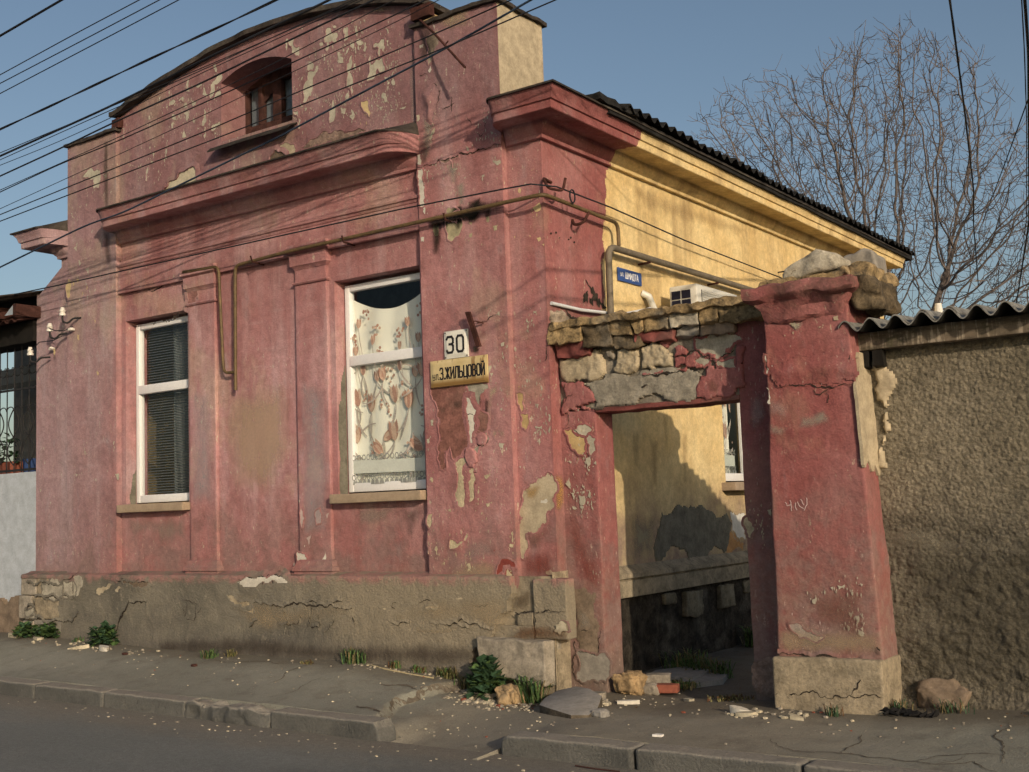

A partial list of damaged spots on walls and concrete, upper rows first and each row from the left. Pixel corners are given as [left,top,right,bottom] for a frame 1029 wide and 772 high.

peeling [149,64,224,142]
flaking render [266,19,406,160]
flaking render [134,143,201,190]
flaking render [559,332,744,410]
peeling [427,333,551,520]
peeling [490,409,597,588]
flaking render [234,545,308,595]
crack [115,598,147,632]
crack [249,597,355,634]
crack [357,680,463,718]
crack [777,647,881,699]
crack [770,723,1011,771]